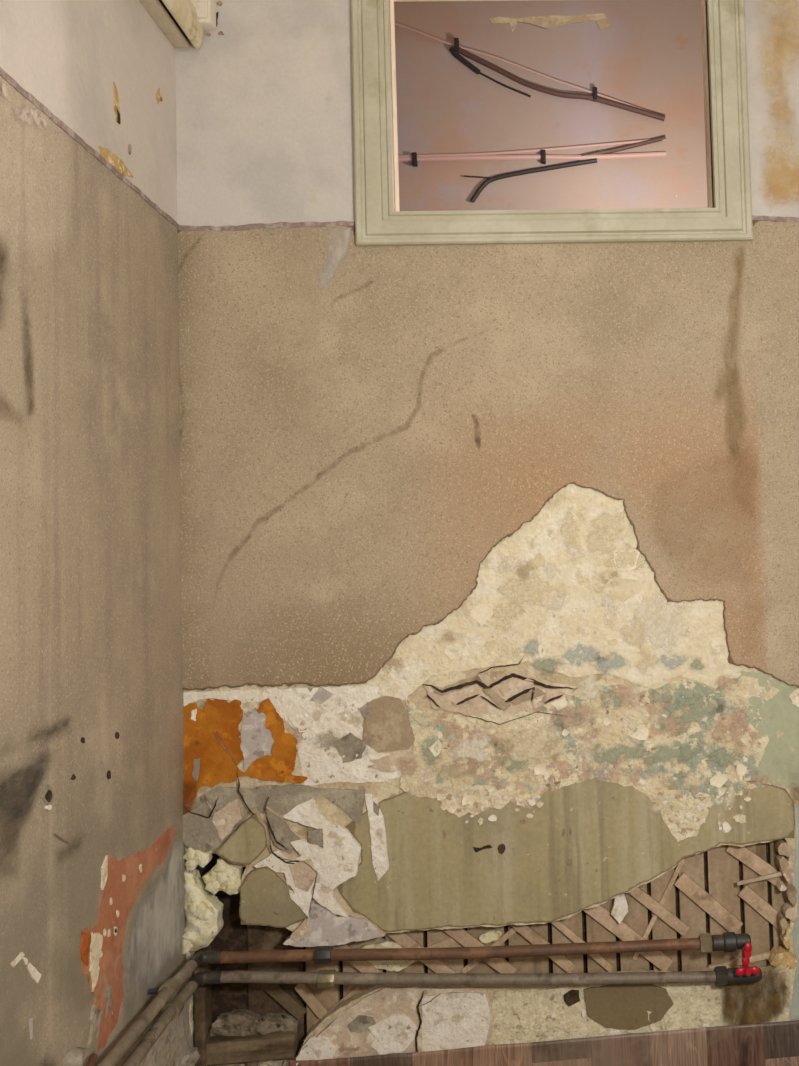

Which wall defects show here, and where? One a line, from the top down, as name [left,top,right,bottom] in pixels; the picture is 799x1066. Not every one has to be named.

flaking render [113,82,121,124]
peeling [98,144,134,178]
flaking render [80,484,799,1066]